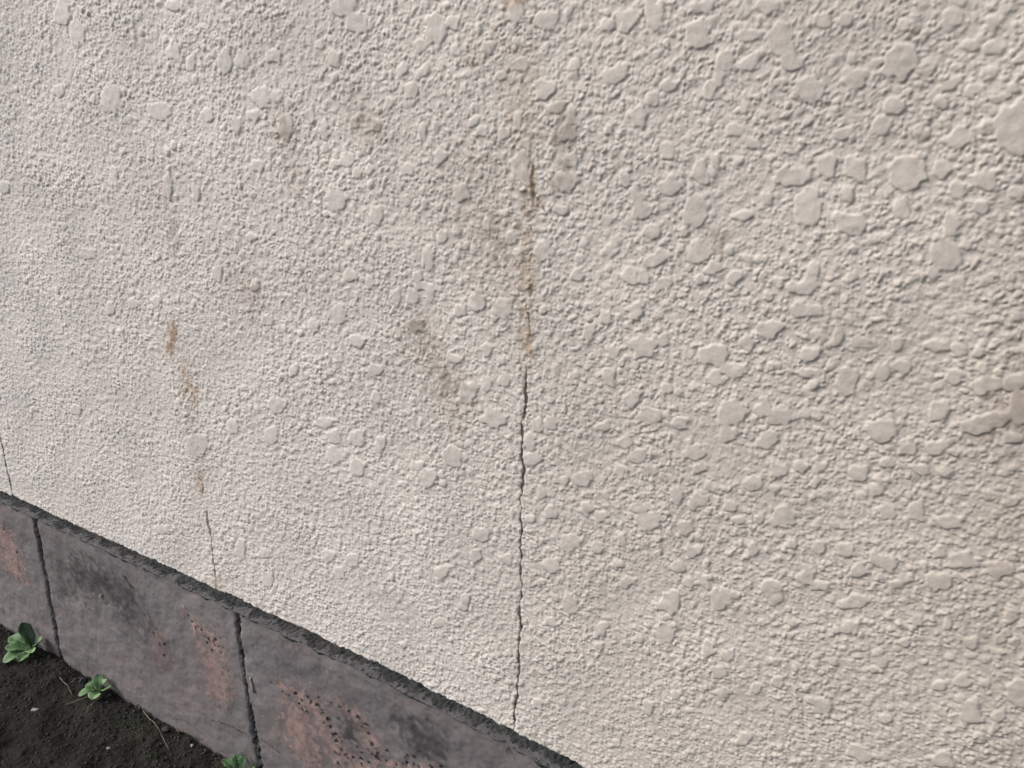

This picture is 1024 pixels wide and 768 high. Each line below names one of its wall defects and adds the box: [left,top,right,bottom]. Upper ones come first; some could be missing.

crack [531,166,545,239]
crack [198,476,216,579]
crack [506,285,548,754]